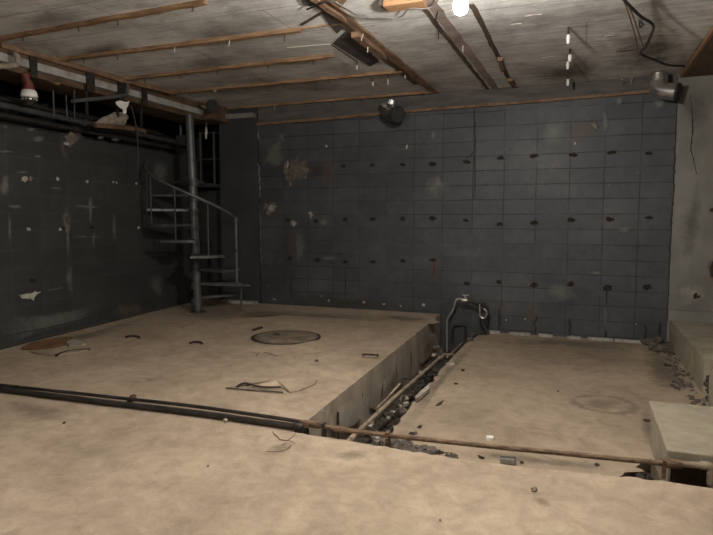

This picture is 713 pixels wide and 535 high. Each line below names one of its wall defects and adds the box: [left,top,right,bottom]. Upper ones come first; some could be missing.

peeling [61,131,83,147]
crack [466,109,476,200]
crack [644,97,697,339]
spalling [18,291,40,301]
leakage [392,335,701,443]
spalling [409,331,708,480]
leakage [565,393,655,460]
spalling [670,468,708,488]